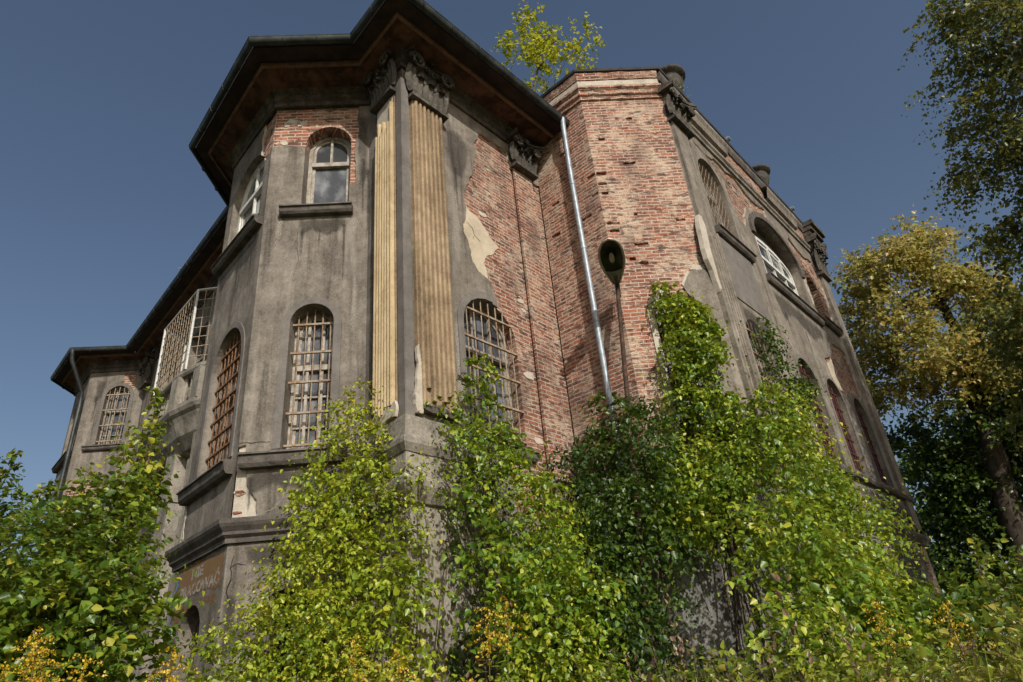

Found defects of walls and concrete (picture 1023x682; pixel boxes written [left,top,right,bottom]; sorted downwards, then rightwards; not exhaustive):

spalling [261,123,288,160]